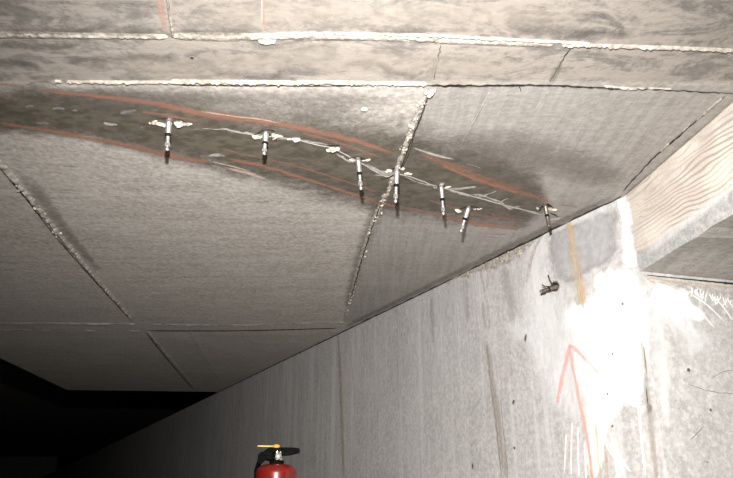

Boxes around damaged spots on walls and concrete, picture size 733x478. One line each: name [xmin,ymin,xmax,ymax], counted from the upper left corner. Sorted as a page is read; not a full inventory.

leakage [0,90,542,226]
crack [168,45,733,417]